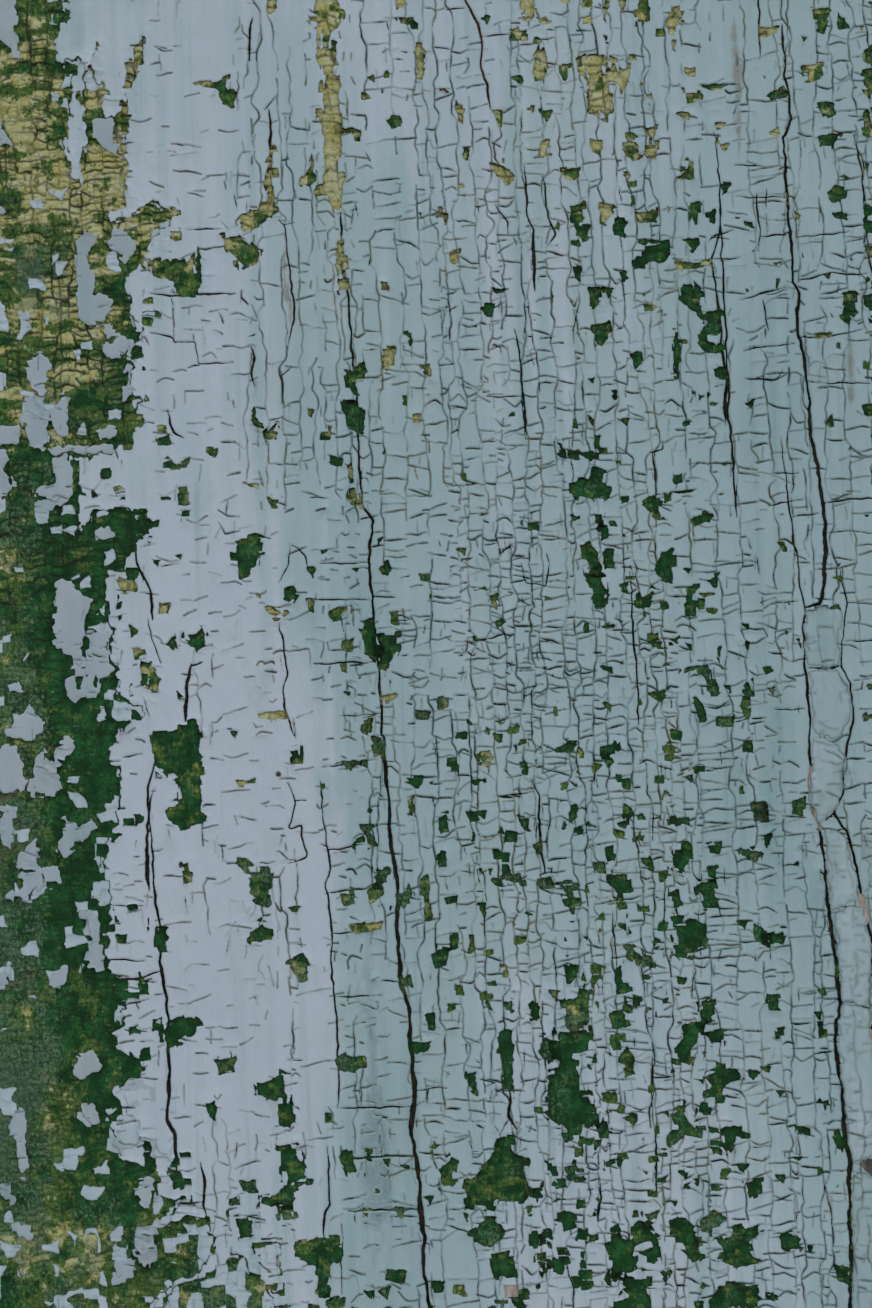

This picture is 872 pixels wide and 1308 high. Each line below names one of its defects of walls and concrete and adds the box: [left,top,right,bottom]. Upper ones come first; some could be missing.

peeling [527,105,581,182]
peeling [505,0,685,123]
peeling [801,7,867,42]
peeling [859,45,872,137]
crack [146,97,295,409]
peeling [811,155,872,349]
crack [166,411,183,438]
crack [130,528,205,722]
peeling [0,0,413,1308]
crack [241,0,872,1308]
peeling [336,415,838,1308]
crack [113,754,290,1235]